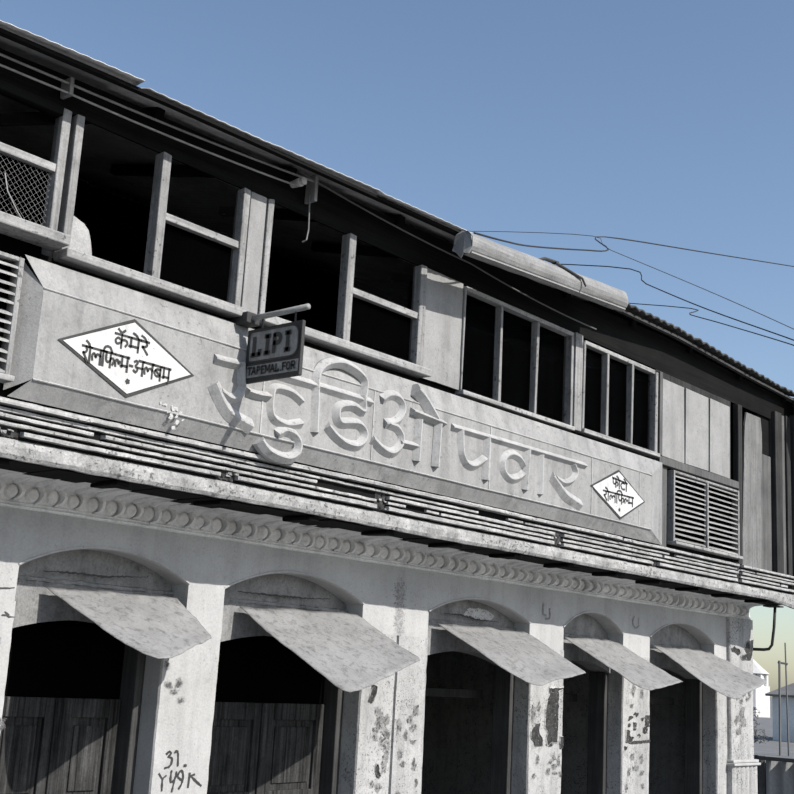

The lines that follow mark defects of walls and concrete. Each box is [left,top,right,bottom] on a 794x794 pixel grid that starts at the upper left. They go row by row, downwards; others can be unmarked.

peeling [368,685,419,792]
spalling [530,686,564,777]
spalling [624,684,650,793]